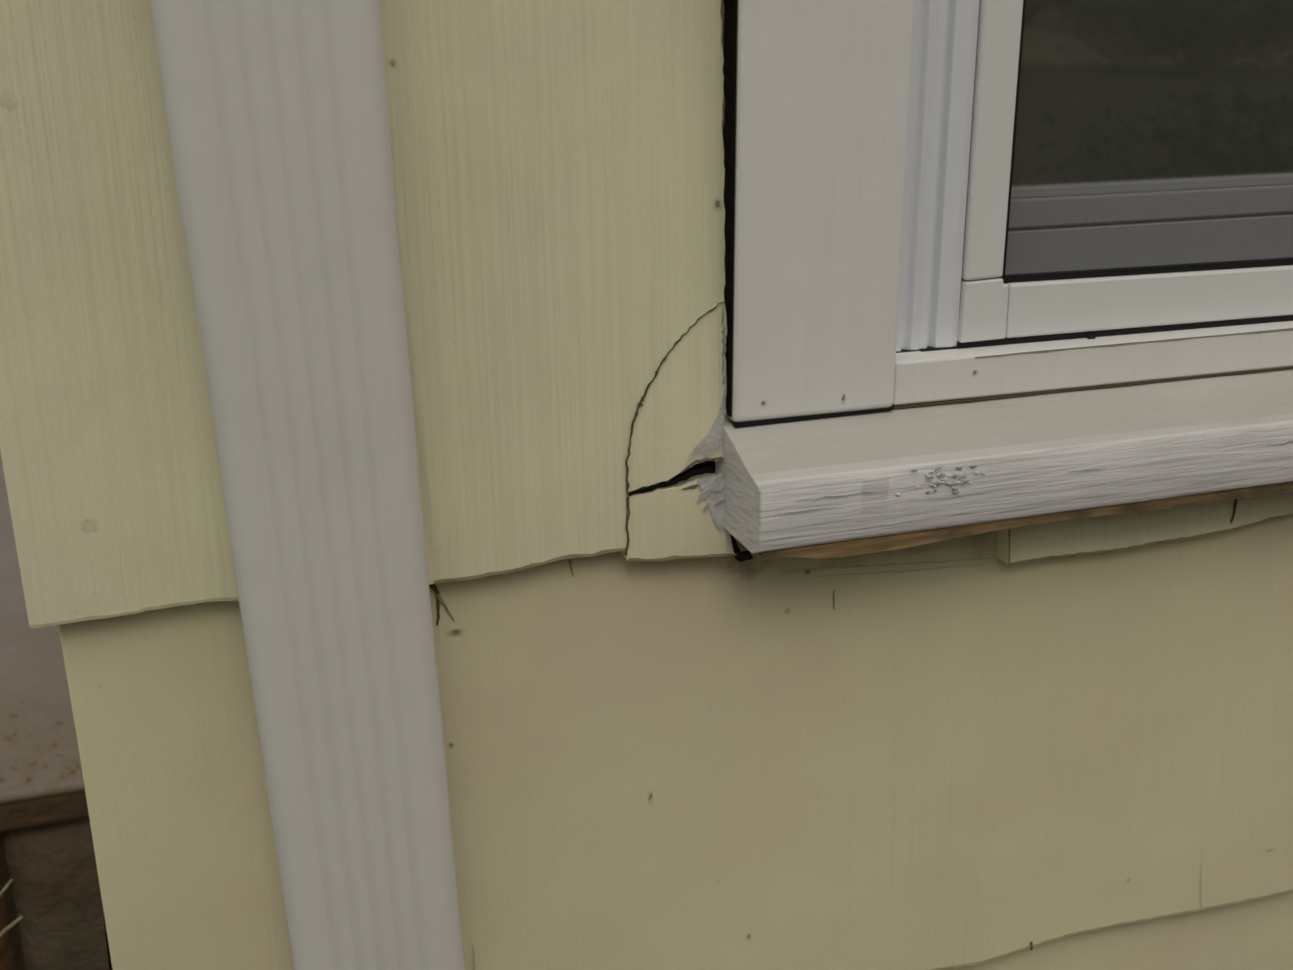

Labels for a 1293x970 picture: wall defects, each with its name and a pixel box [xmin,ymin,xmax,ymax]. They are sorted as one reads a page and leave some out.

crack [625,301,725,555]
crack [1230,499,1238,523]